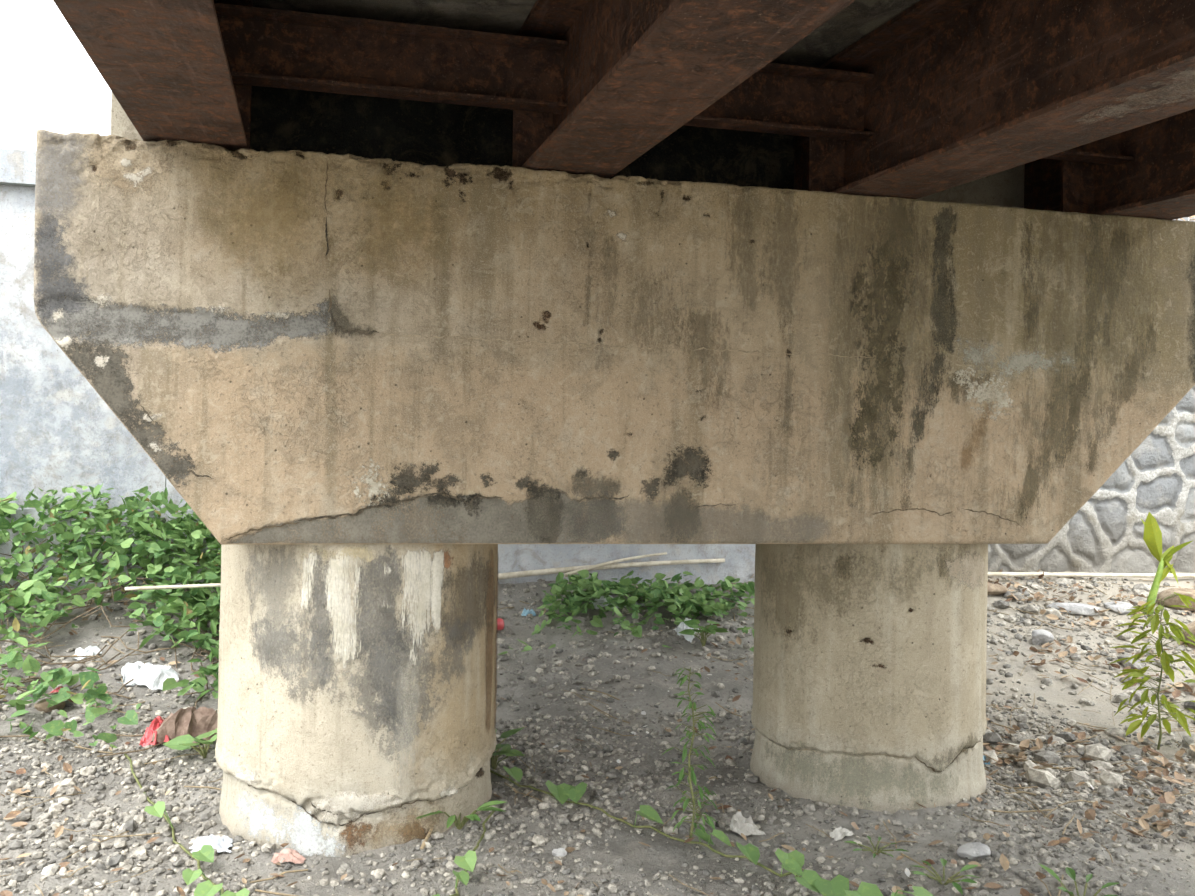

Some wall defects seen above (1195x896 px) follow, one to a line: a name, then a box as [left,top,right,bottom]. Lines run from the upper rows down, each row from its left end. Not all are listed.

damp [849,198,1126,519]
damp [1089,326,1156,469]
damp [352,460,496,517]
damp [516,470,620,543]
damp [639,445,711,541]
damp [300,545,495,745]
crack [234,768,485,826]
crack [868,735,981,772]